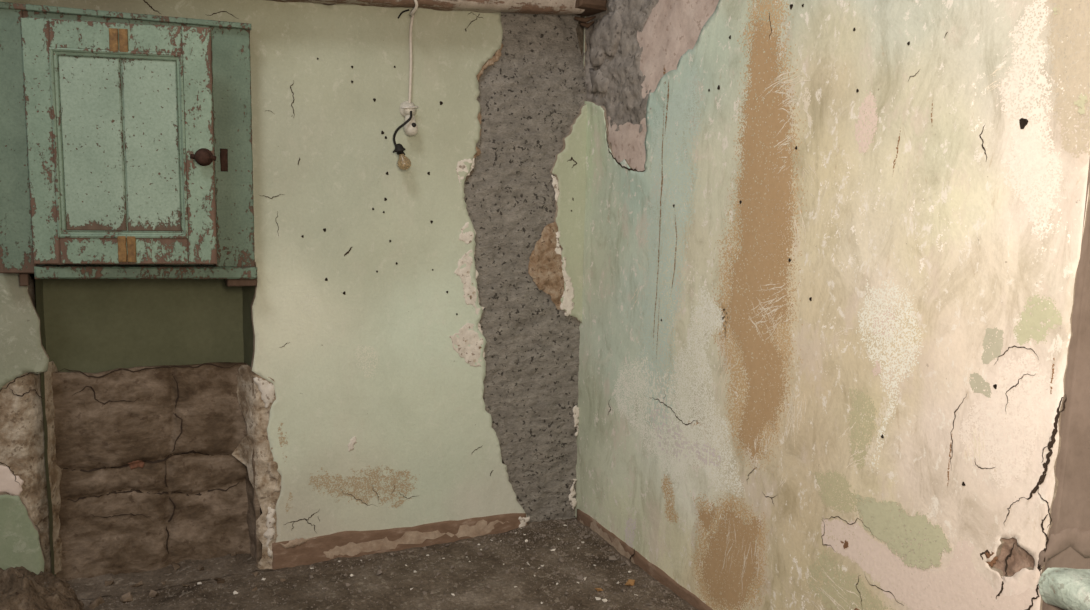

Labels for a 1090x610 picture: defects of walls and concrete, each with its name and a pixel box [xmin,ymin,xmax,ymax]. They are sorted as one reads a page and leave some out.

peeling [637,0,719,99]
flaking render [456,112,482,183]
flaking render [551,175,562,202]
peeling [605,116,647,172]
flaking render [449,222,486,367]
flaking render [528,222,575,316]
flaking render [0,361,316,581]
water stain [308,464,420,508]
peeling [323,516,530,559]
peeling [821,494,1090,610]
crack [1004,394,1067,610]